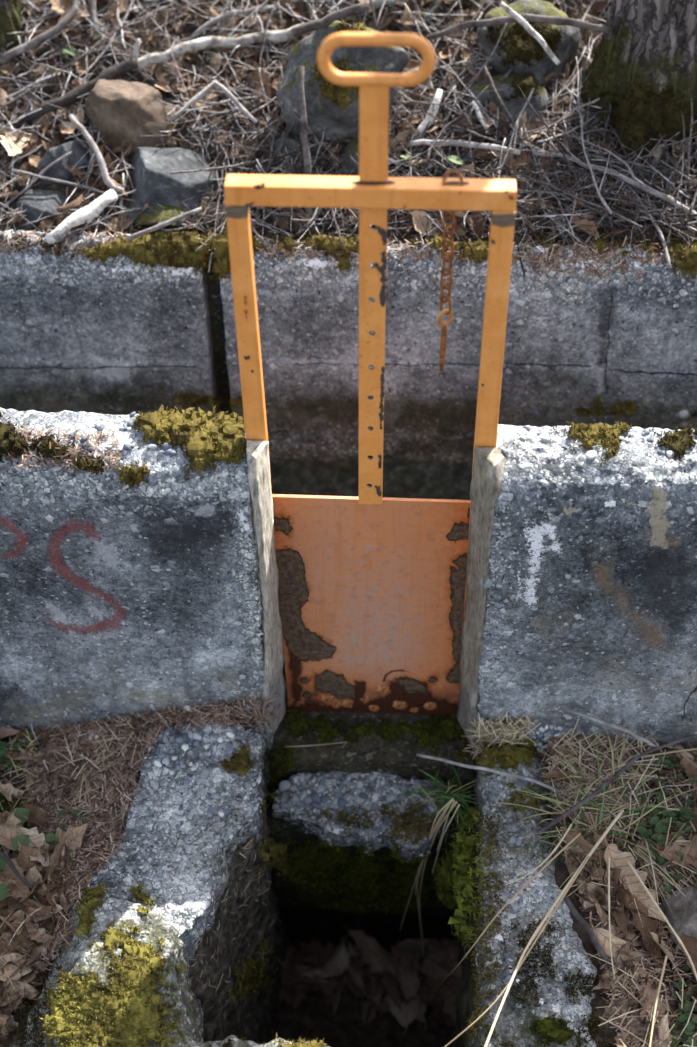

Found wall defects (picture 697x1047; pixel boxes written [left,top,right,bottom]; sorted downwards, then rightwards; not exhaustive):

rust [287,653,458,717]